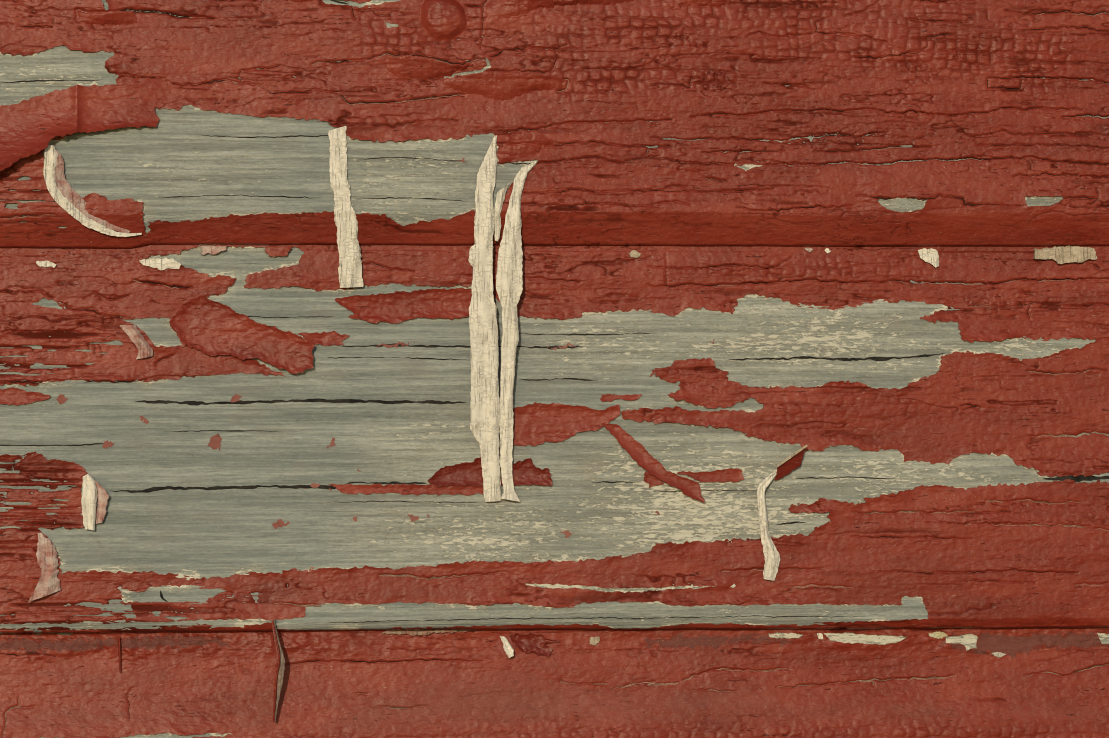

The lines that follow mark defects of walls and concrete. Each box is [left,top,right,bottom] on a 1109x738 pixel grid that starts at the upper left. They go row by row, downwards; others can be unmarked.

crack [794,0,956,59]
crack [1006,10,1109,31]
crack [117,0,705,127]
crack [498,76,1109,212]
peeling [0,45,1109,604]
crack [860,499,1108,539]
crack [898,569,1103,587]
crack [289,658,449,666]
peeling [0,583,928,722]
crack [560,668,953,693]
peeling [928,631,978,650]
peeling [1097,632,1109,644]